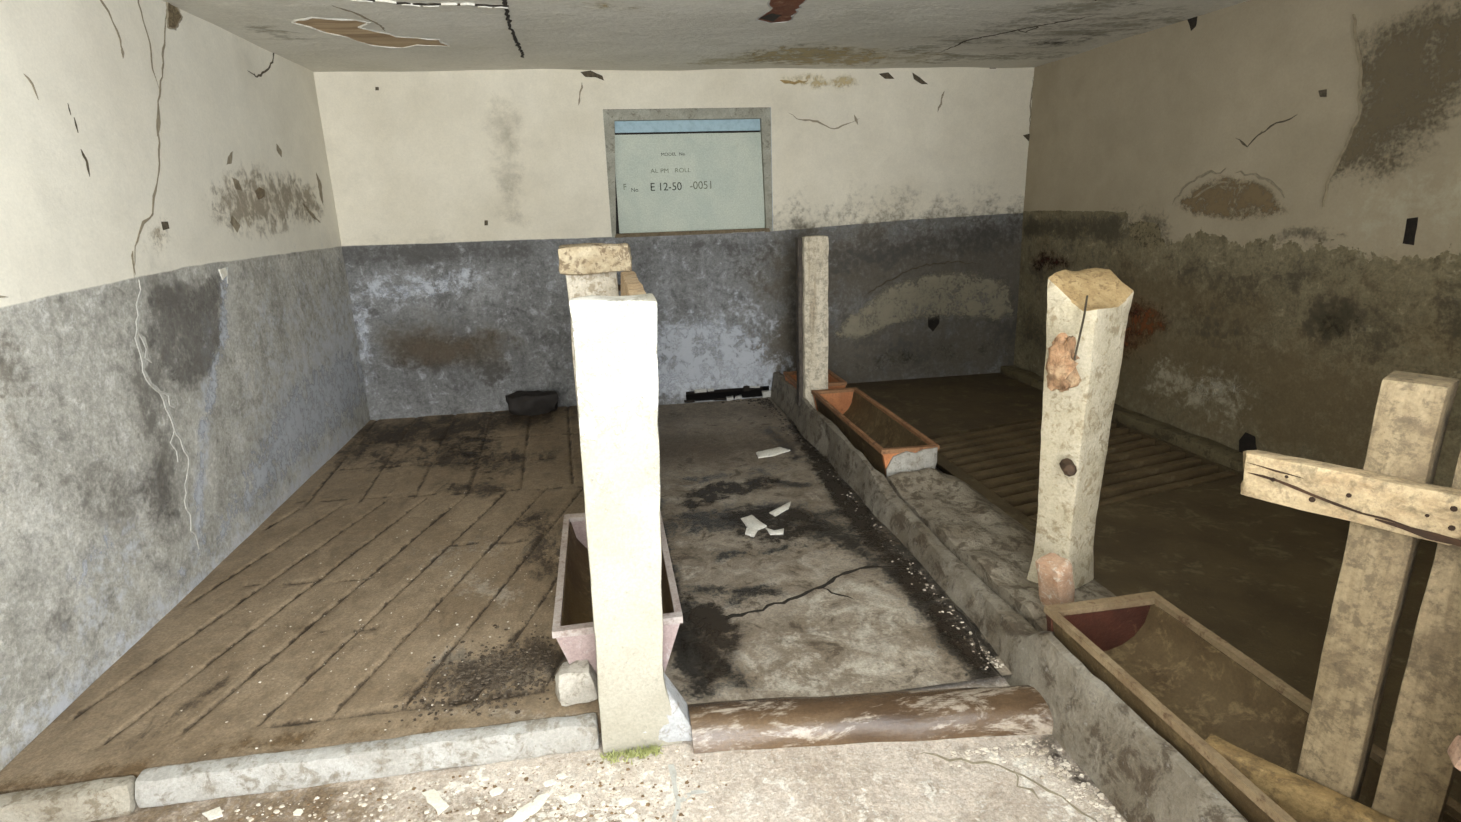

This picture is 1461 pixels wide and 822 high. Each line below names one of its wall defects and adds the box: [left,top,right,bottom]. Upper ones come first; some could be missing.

peeling [291,17,450,48]
crack [334,0,524,58]
peeling [755,0,807,23]
crack [247,53,274,78]
crack [1236,115,1296,147]
leakage [220,151,323,233]
crack [100,0,200,549]
corrosion [1123,301,1166,357]
leakage [148,267,368,544]
crack [690,565,896,631]